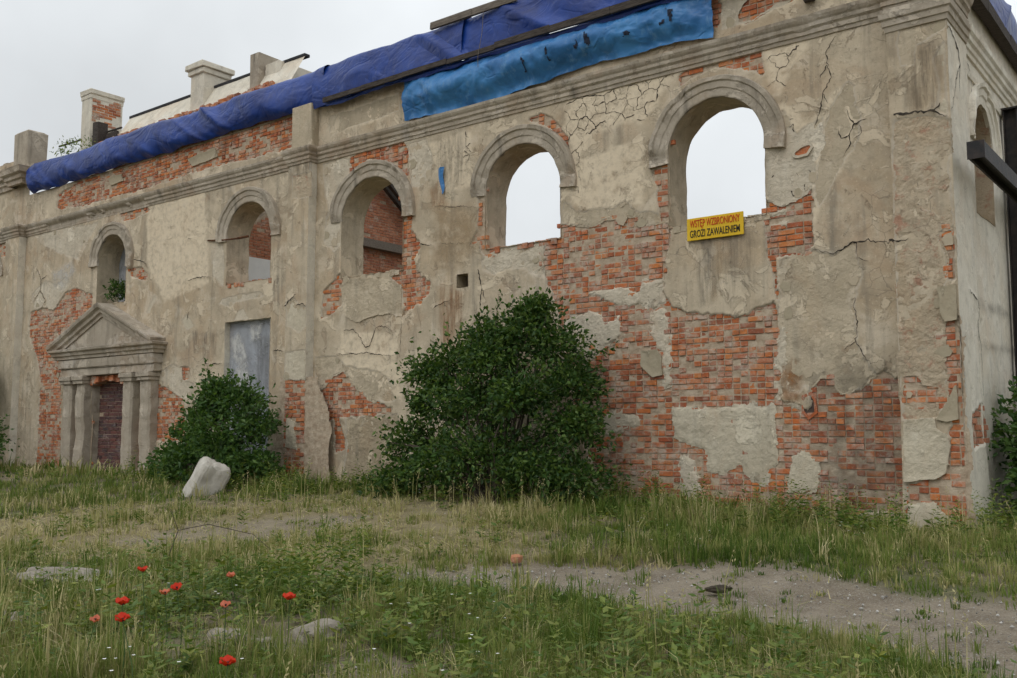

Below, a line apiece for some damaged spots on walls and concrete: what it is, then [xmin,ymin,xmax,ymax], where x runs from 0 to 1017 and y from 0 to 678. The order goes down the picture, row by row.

peeling [711,0,793,30]
flaking render [92,98,121,129]
flaking render [58,114,292,210]
peeling [324,140,433,250]
crack [767,45,799,87]
crack [790,40,865,155]
crack [893,27,972,116]
flaking render [392,216,431,315]
flaking render [471,83,990,530]
crack [813,238,907,261]
flaking render [30,278,93,468]
flaking render [274,351,402,485]